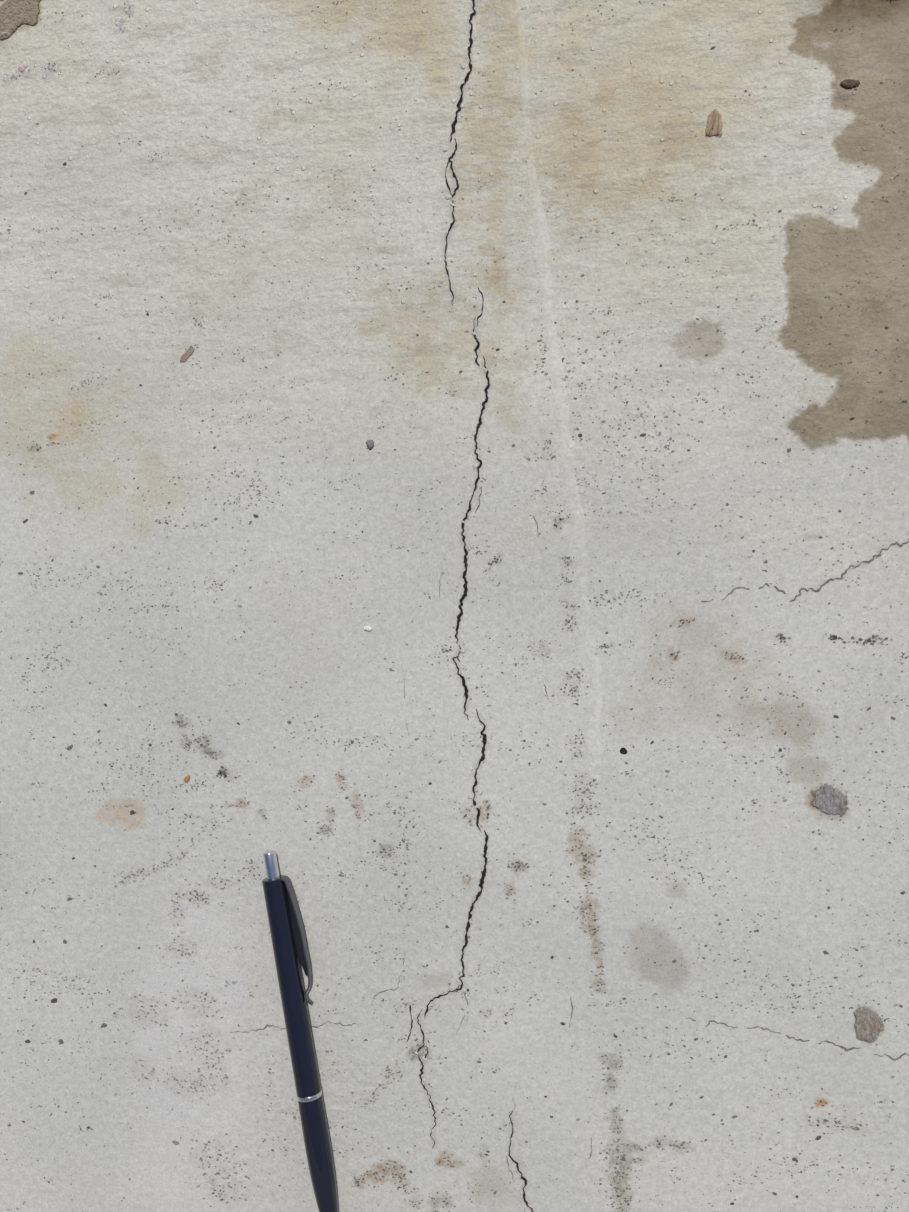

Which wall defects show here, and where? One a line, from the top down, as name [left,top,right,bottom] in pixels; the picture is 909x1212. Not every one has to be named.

crack [230,0,491,1149]
crack [701,541,909,602]
crack [506,1098,533,1212]